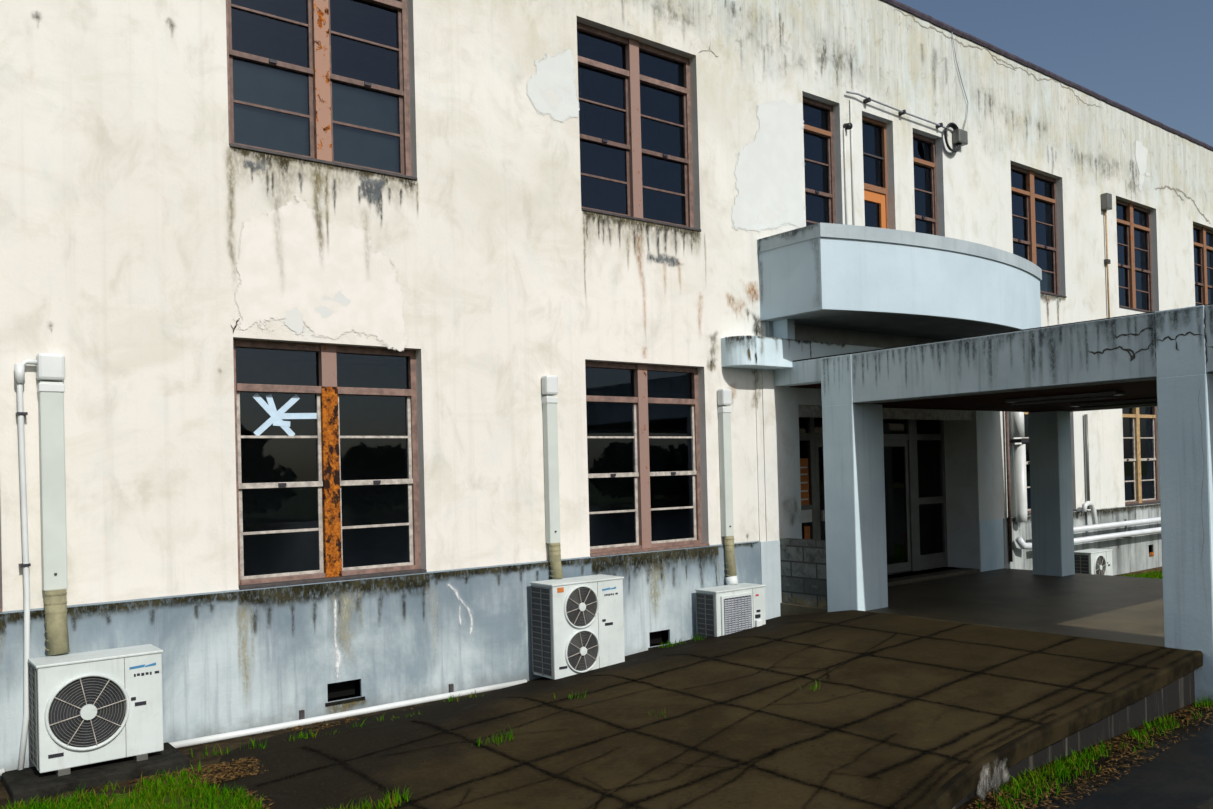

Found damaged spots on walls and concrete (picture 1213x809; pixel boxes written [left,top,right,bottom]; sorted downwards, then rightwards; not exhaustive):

damp [229,147,418,243]
crack [1155,185,1211,224]
damp [862,294,1065,376]
damp [1135,307,1212,344]
crack [1088,306,1213,607]
crack [588,634,895,809]